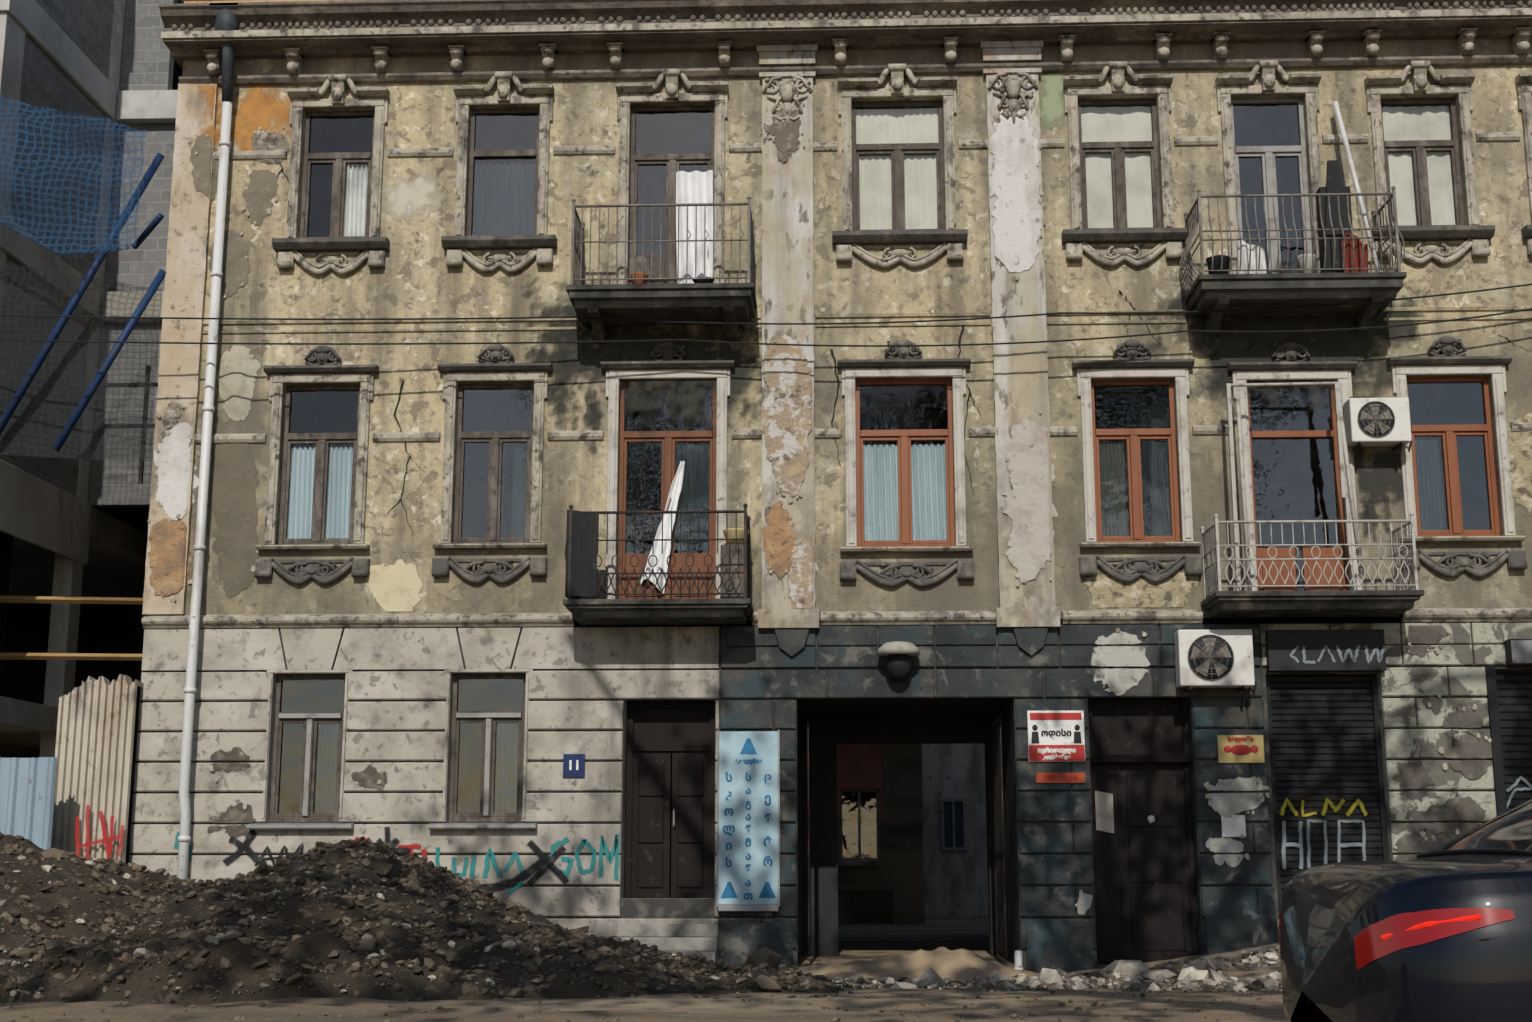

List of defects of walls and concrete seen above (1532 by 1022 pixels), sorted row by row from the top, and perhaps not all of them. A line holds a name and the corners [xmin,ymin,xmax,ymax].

peeling [148,395,212,602]
crack [388,380,424,535]
peeling [760,333,819,608]
peeling [1002,410,1058,586]
spalling [1084,561,1200,611]
peeling [1091,628,1150,696]
peeling [1405,625,1451,657]
spalling [208,747,250,782]
peeling [1204,777,1270,818]
peeling [1393,694,1492,861]
peeling [1205,834,1250,867]